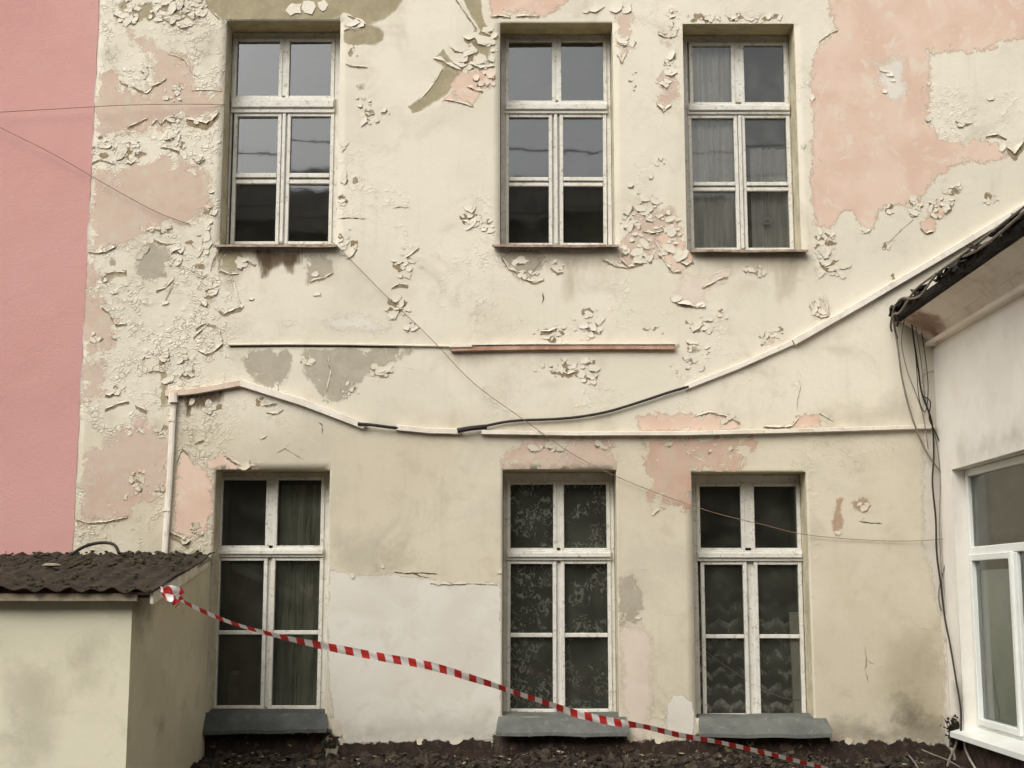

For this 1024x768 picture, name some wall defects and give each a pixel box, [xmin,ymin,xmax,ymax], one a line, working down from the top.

peeling [408,0,568,113]
peeling [801,0,1024,279]
peeling [76,0,411,550]
peeling [383,247,419,332]
peeling [603,181,730,373]
peeling [532,307,605,385]
peeling [500,436,616,469]
peeling [635,410,757,515]
peeling [764,412,833,429]